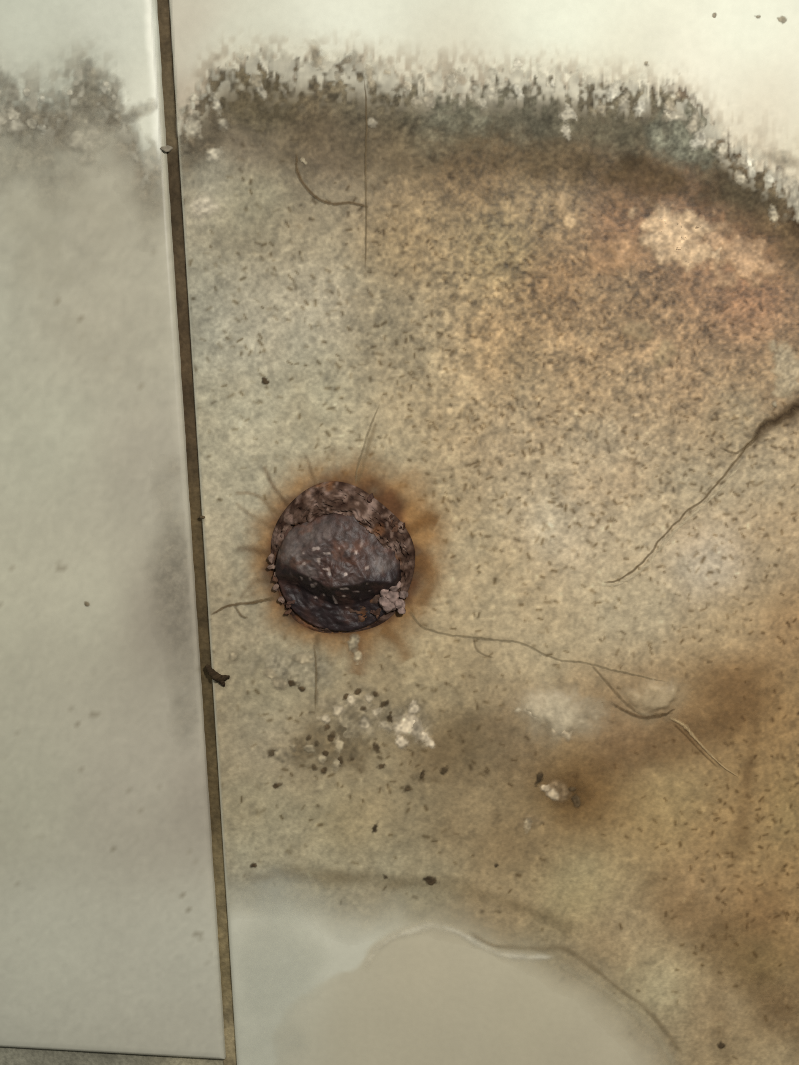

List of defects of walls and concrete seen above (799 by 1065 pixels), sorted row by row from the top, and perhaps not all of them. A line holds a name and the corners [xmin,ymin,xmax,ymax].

damp [0,76,129,143]
rust [257,468,435,645]
damp [180,56,799,1065]
crack [609,401,799,586]